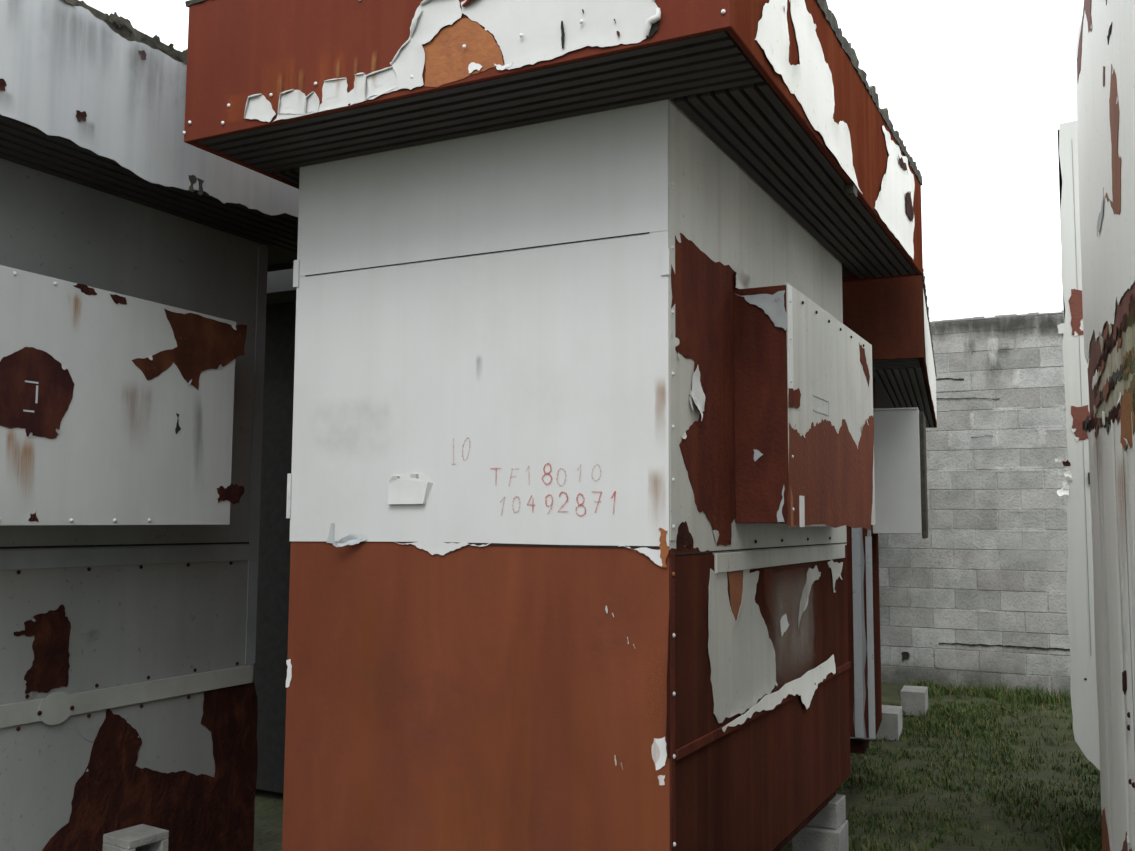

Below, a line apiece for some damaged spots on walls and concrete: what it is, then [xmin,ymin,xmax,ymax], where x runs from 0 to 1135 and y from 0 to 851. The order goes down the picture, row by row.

peeling [244,0,661,122]
peeling [755,0,863,194]
peeling [875,126,915,260]
corrosion [0,347,74,458]
corrosion [132,309,247,390]
peeling [735,264,788,331]
corrosion [1069,283,1135,451]
peeling [395,539,491,555]
peeling [618,546,662,566]
corrosion [14,604,71,694]
peeling [708,559,843,732]
corrosion [42,682,258,851]